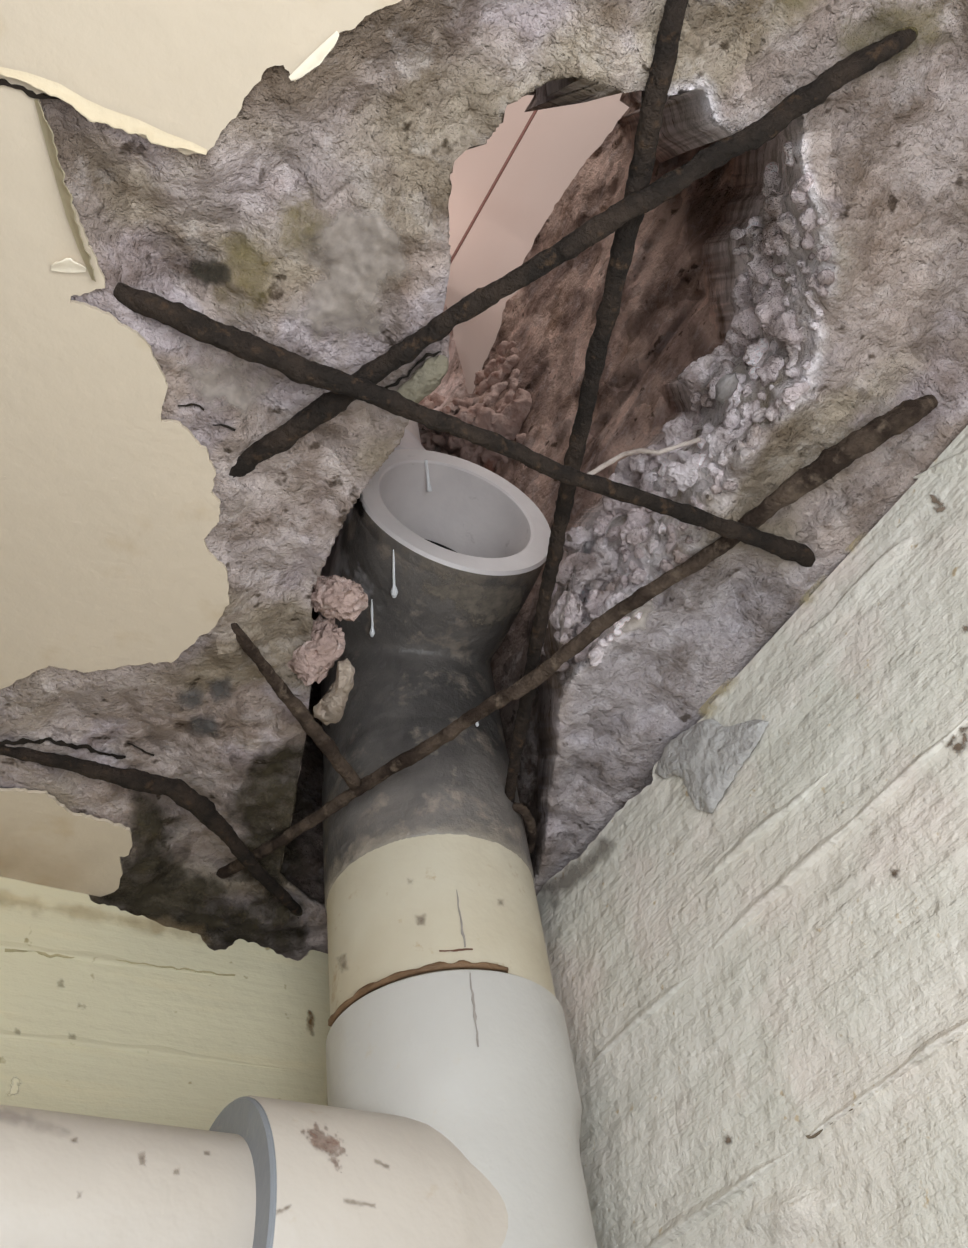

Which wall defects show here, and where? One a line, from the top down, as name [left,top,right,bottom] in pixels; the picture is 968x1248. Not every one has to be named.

crack [0,737,154,759]
spalling [0,0,968,961]